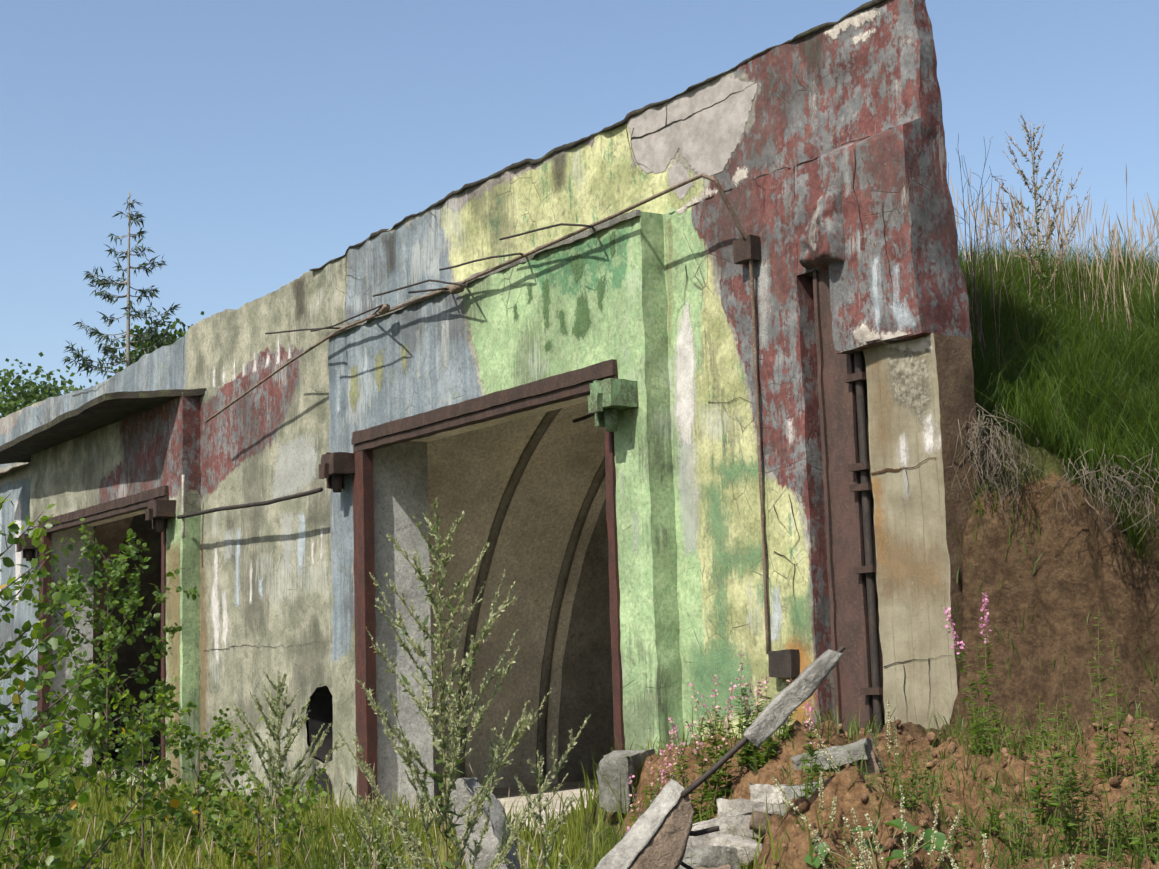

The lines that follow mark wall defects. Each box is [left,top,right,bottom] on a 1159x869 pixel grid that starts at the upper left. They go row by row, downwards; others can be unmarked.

crack [626,84,752,171]
peeling [627,76,757,214]
crack [871,457,936,494]
rust [786,643,810,685]
rust [790,697,812,725]
crack [884,655,951,723]